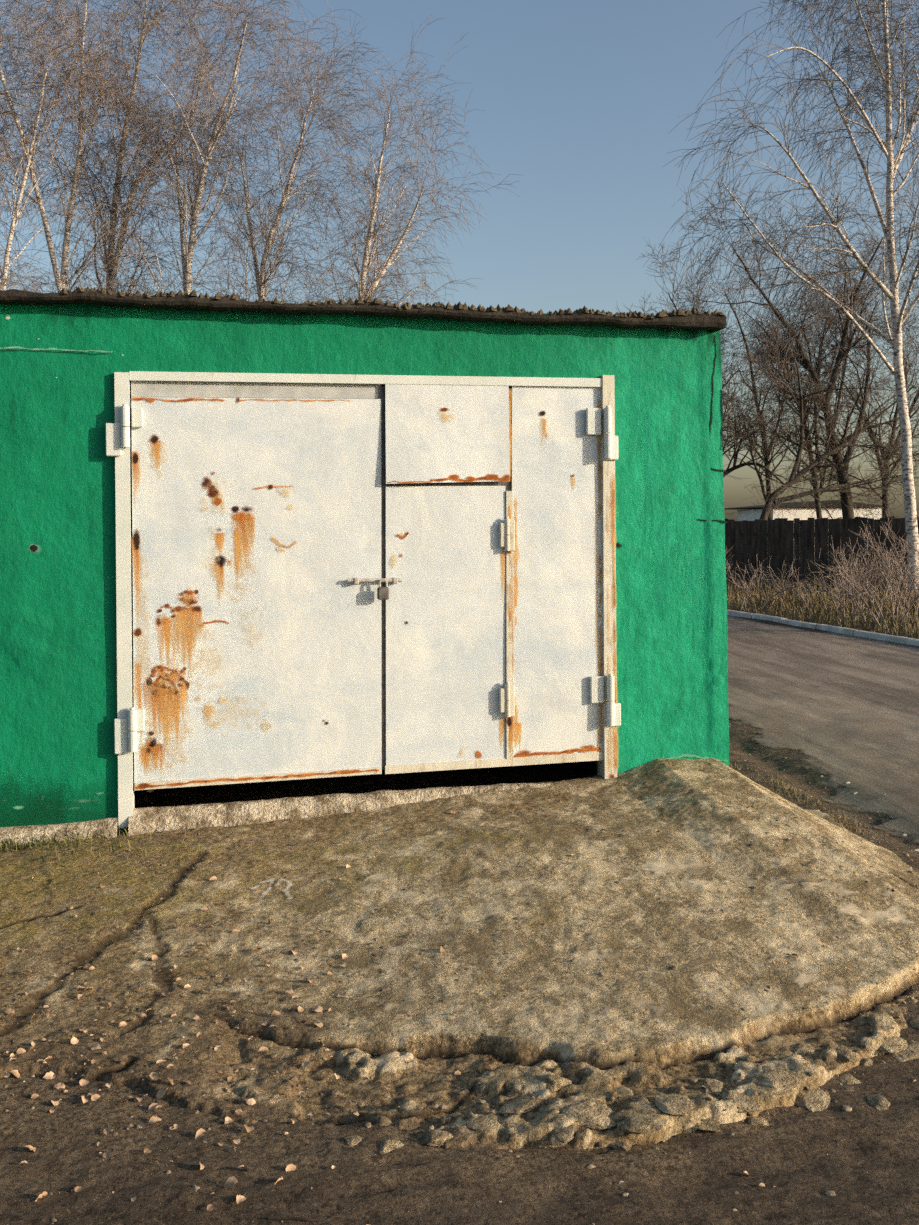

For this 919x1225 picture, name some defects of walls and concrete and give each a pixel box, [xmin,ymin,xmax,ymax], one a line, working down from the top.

corrosion [132,435,161,483]
corrosion [203,472,254,593]
corrosion [134,590,380,789]
corrosion [500,435,618,778]